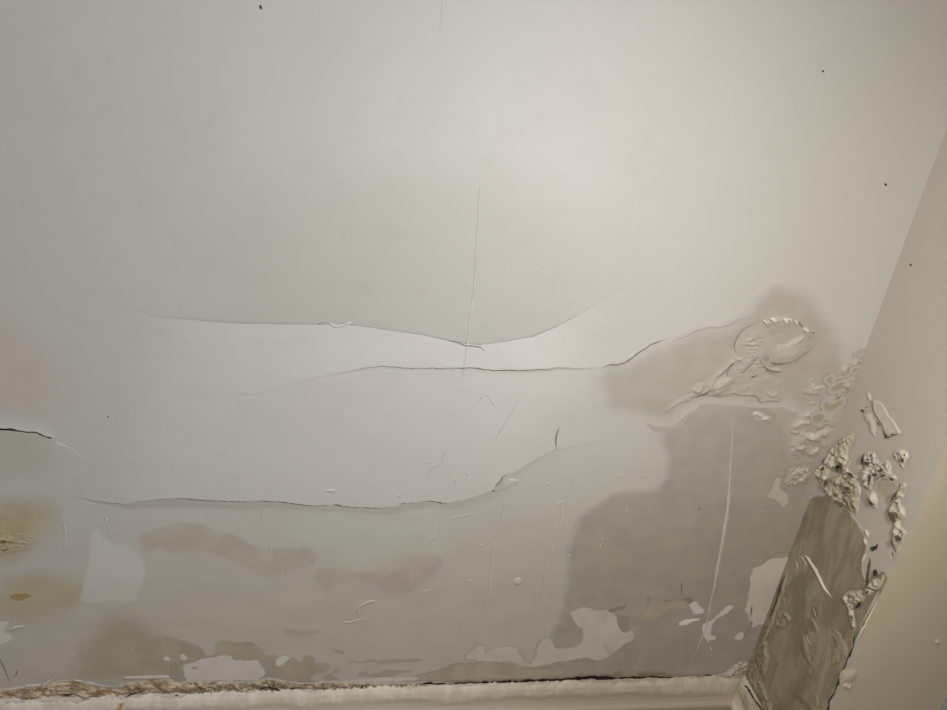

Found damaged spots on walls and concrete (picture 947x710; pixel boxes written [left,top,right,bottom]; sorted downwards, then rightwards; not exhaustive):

crack [337,317,751,374]
crack [0,413,55,441]
water stain [53,273,858,689]
flaking render [678,392,911,710]
spalling [0,676,453,700]